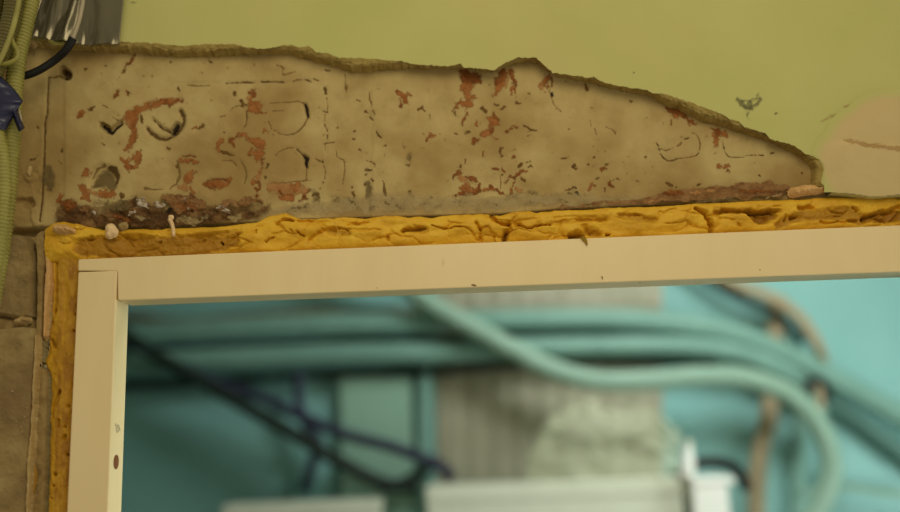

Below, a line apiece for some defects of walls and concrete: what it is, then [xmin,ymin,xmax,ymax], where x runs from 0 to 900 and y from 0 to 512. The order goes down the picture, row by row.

crack [189,65,382,184]
flaking render [12,38,832,241]
crack [656,133,701,161]